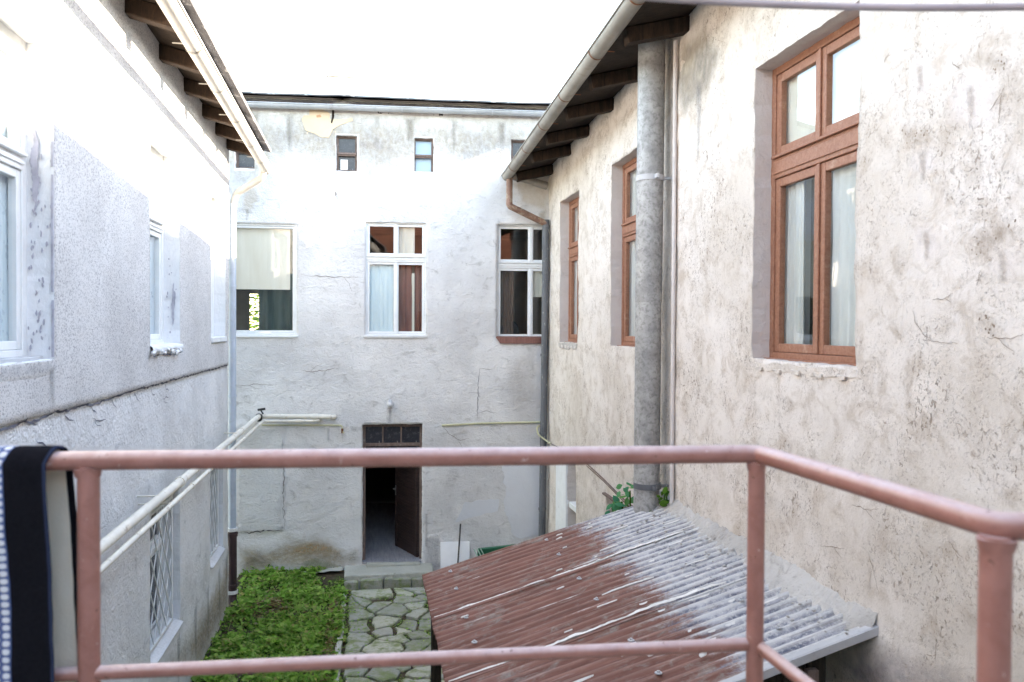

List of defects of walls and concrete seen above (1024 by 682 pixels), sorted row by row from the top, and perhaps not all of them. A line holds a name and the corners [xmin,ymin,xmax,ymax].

flaking render [302,110,353,138]
crack [0,364,267,446]
water stain [150,527,367,663]